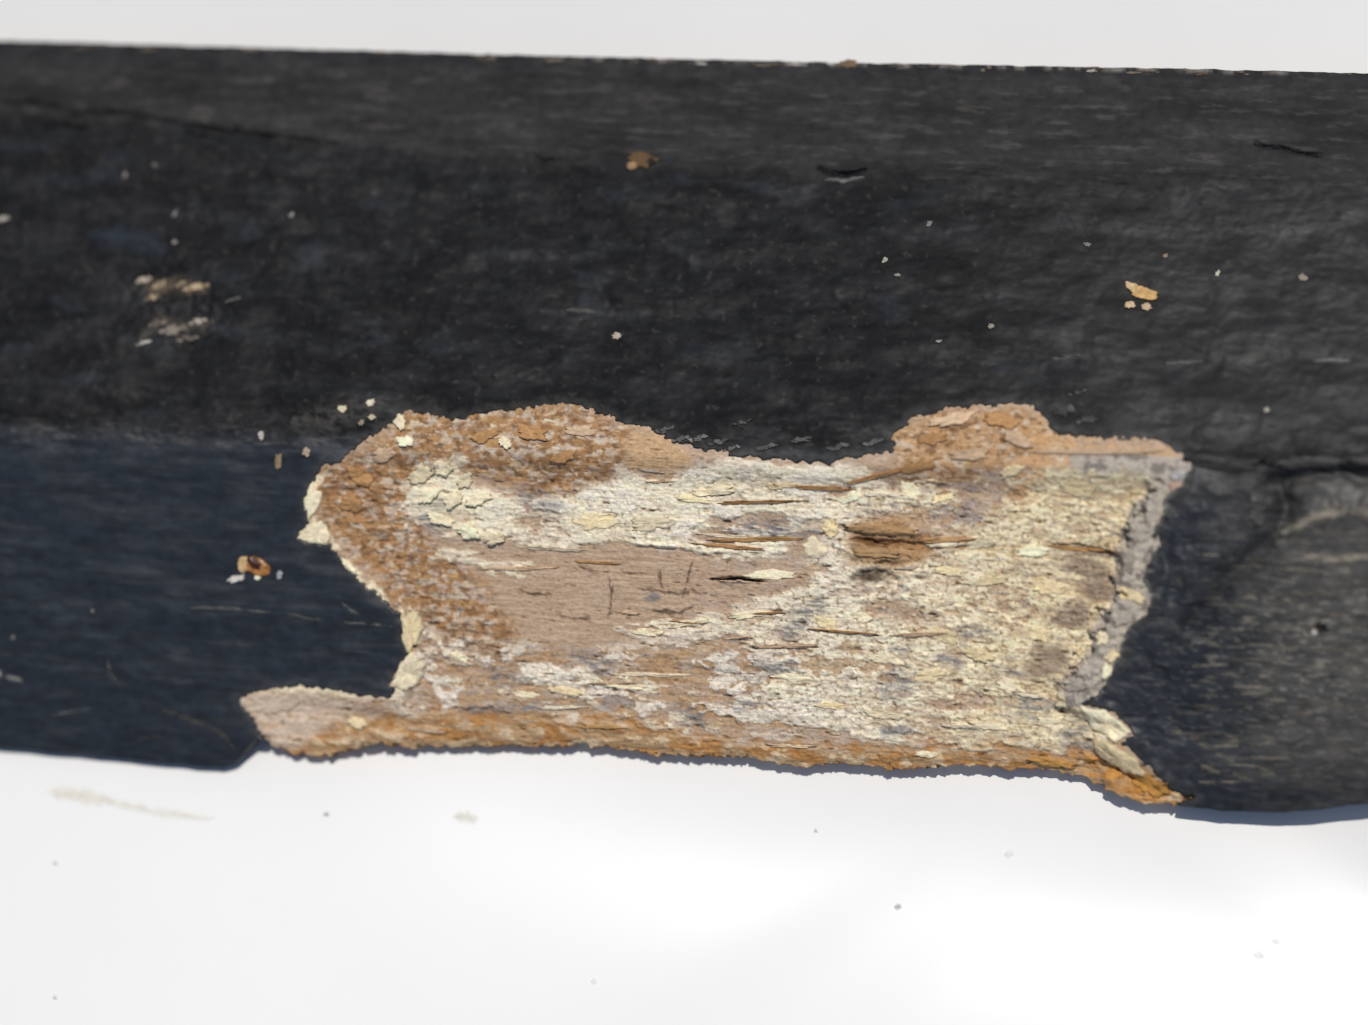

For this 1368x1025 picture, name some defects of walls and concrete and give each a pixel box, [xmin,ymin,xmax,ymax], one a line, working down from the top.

peeling [136,276,210,301]
peeling [1125,281,1158,311]
peeling [136,316,213,346]
peeling [226,555,283,583]
spalling [240,389,1368,806]